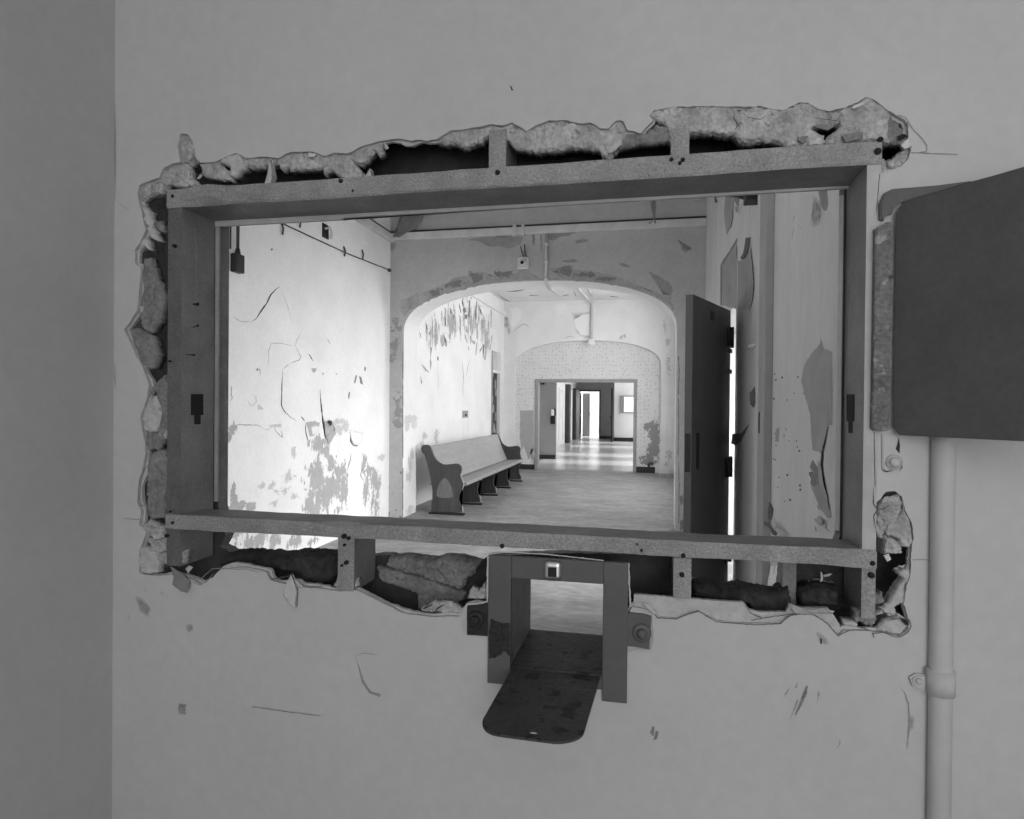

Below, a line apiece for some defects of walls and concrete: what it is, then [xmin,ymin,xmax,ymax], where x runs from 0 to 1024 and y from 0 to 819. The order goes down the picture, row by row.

flaking render [437,98,927,173]
peeling [393,215,423,237]
peeling [468,232,588,252]
peeling [714,196,754,313]
flaking render [124,135,389,608]
crack [234,287,330,430]
crack [320,393,329,438]
peeling [257,417,415,518]
peeling [390,259,683,531]
peeling [731,424,749,445]
peeling [767,566,777,586]
flaking render [814,488,914,638]